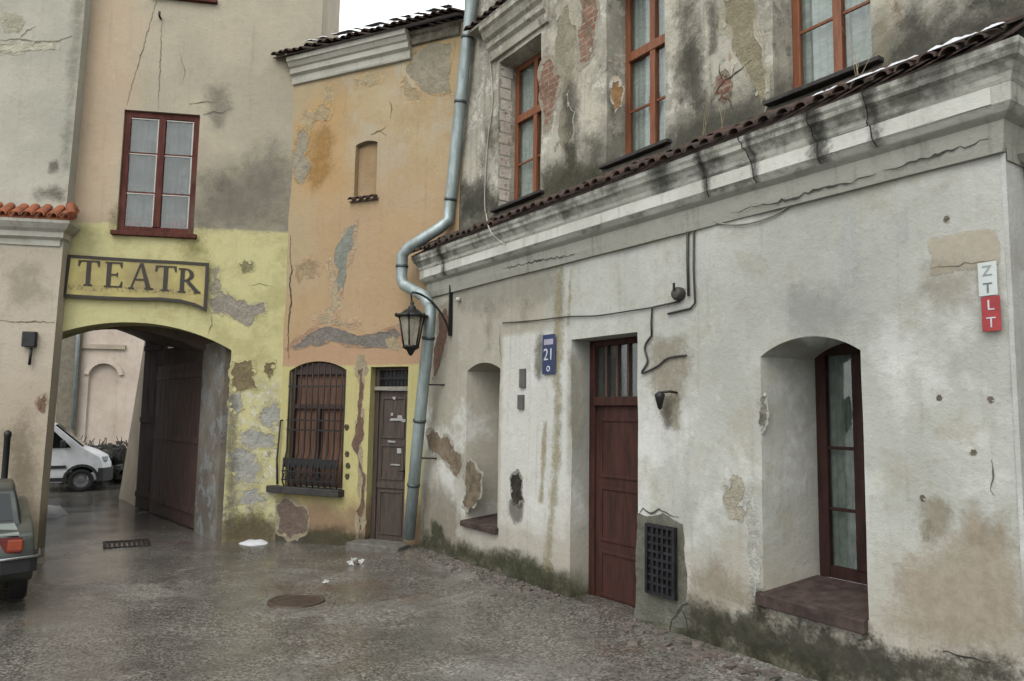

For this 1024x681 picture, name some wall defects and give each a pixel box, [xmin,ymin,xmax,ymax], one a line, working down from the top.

crack [127,1,185,108]
peeling [537,0,600,158]
crack [736,91,985,213]
peeling [208,265,269,328]
crack [257,236,293,359]
peeling [227,357,277,419]
flaking render [227,398,311,542]
flaking render [344,354,369,540]
peeling [425,427,484,513]
spalling [509,469,524,507]
water stain [539,270,570,574]
peeling [722,474,763,608]